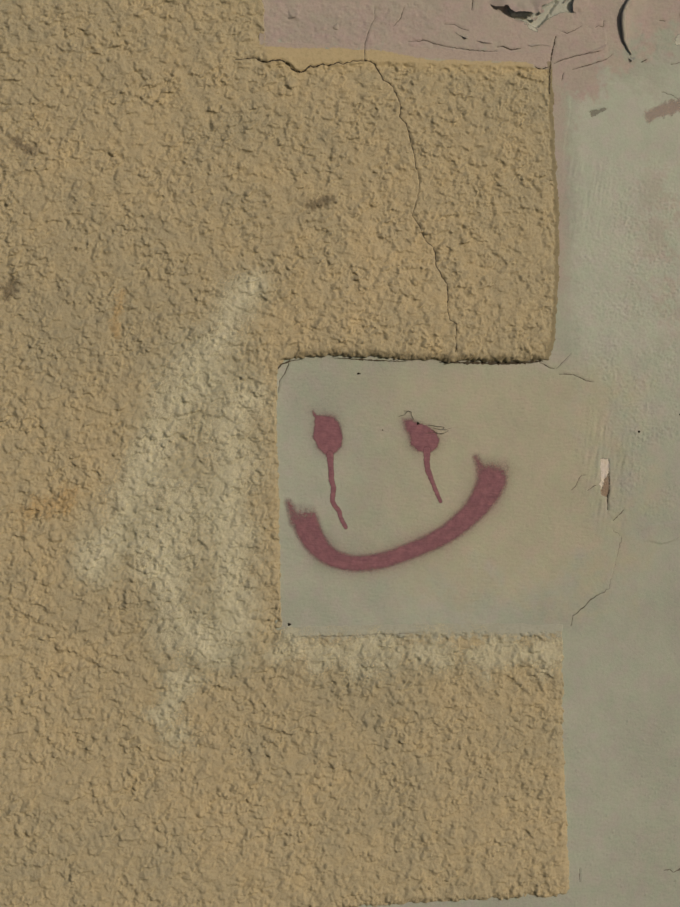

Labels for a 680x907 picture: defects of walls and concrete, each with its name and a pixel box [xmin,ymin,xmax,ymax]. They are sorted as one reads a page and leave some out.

peeling [489,0,590,32]
crack [536,21,612,94]
peeling [621,0,649,61]
crack [235,9,591,382]
crack [278,359,302,392]
spalling [599,458,610,497]
crack [571,475,623,625]